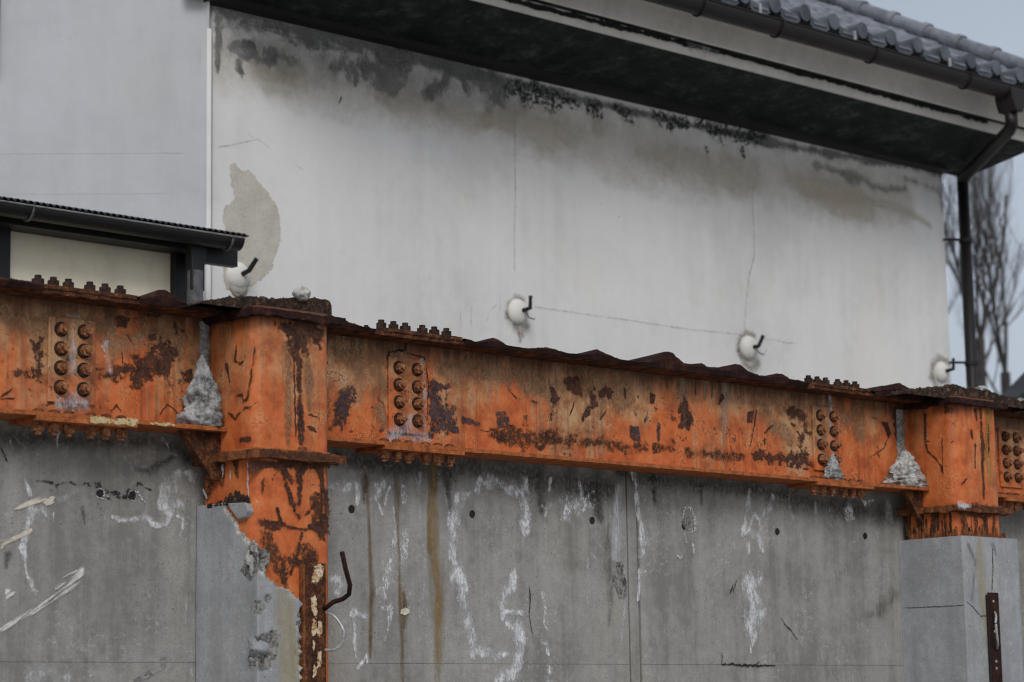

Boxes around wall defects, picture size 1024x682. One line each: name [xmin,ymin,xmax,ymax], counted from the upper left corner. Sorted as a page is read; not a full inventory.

leakage [210,0,988,191]
peeling [223,163,281,290]
corrosion [0,336,44,400]
corrosion [95,322,193,390]
corrosion [204,320,336,588]
corrosion [330,386,357,431]
corrosion [428,376,812,470]
corrosion [920,407,1005,536]
spalling [240,548,270,581]
corrosion [428,462,441,660]
leakage [327,451,901,682]
spalling [248,630,281,671]